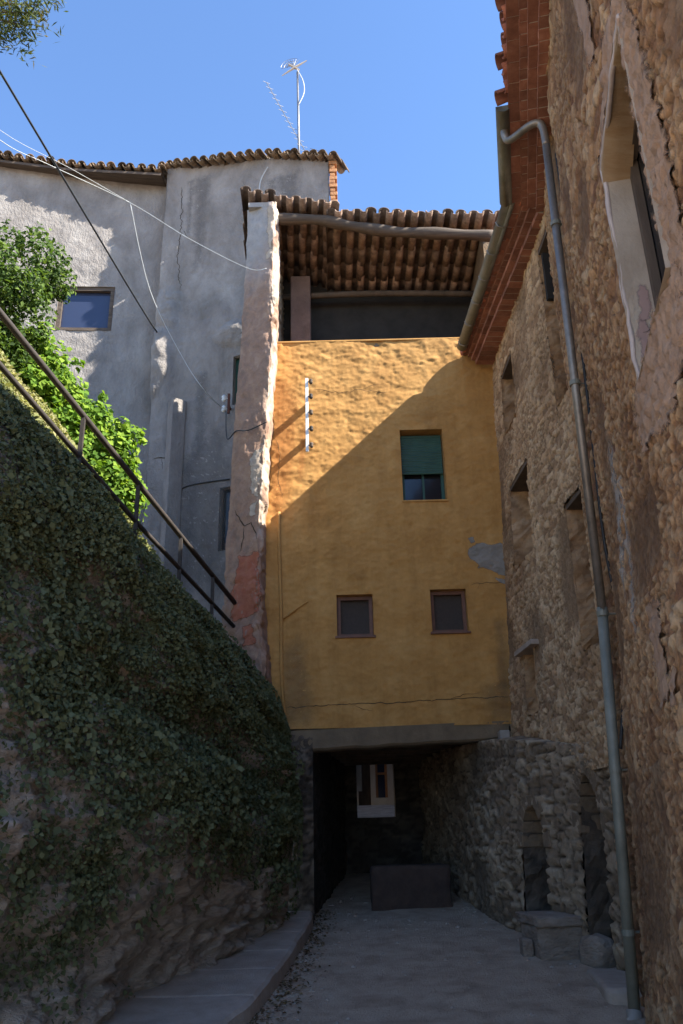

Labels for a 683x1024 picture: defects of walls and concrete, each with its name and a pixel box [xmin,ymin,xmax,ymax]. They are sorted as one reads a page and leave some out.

crack [177,187,187,287]
crack [235,511,257,548]
spalling [230,551,263,647]
flaking render [468,537,505,584]